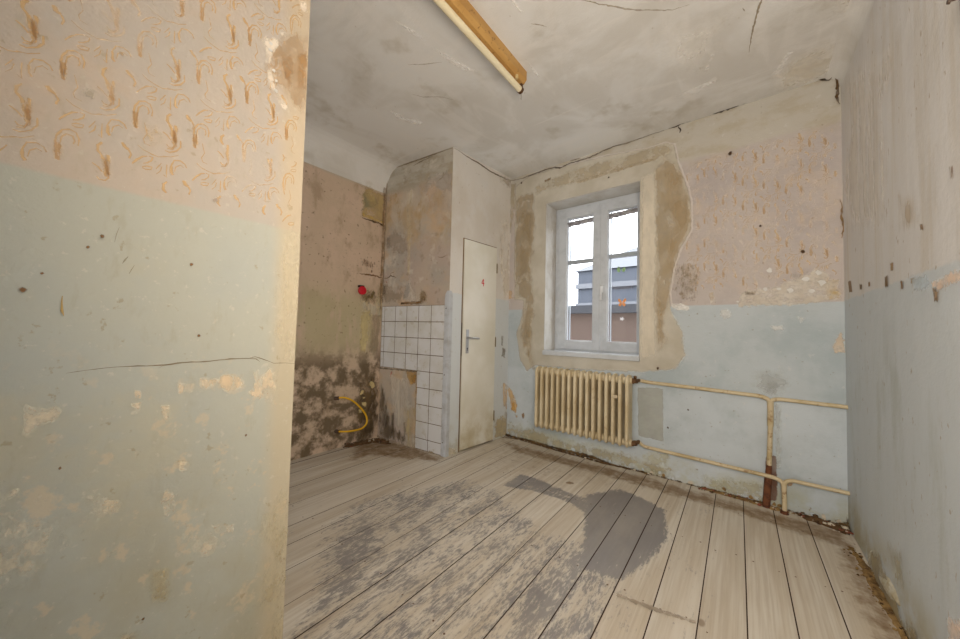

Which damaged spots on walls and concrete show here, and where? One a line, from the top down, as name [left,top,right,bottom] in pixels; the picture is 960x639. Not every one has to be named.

crack [584,0,690,11]
crack [743,0,762,50]
peeling [263,33,282,93]
peeling [514,142,693,372]
crack [70,356,294,373]
damp [357,377,415,441]
corrosion [765,456,793,501]